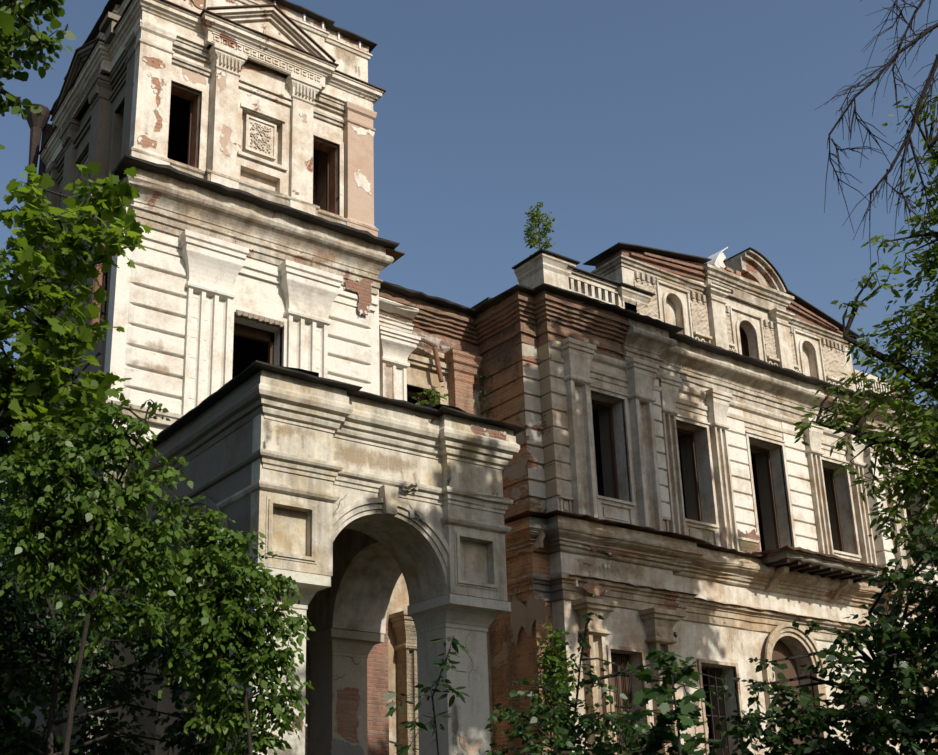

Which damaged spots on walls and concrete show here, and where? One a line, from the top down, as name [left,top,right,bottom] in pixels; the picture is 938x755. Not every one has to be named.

flaking render [137,56,166,149]
flaking render [219,124,233,158]
flaking render [343,278,373,316]
flaking render [574,579,613,597]
flaking render [334,685,362,743]